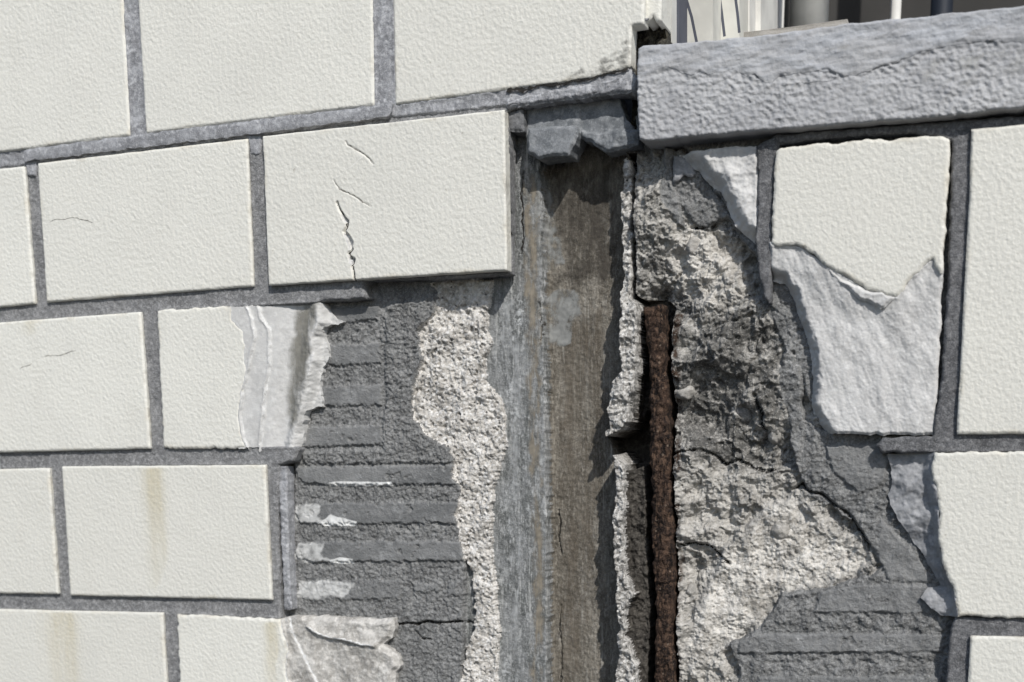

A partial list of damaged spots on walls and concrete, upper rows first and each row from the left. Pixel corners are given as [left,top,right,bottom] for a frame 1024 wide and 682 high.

spalling [635,26,672,75]
crack [333,142,372,281]
spalling [410,278,508,682]
spalling [626,144,881,682]
spalling [769,242,944,436]
spalling [887,452,958,617]
spalling [280,614,403,682]